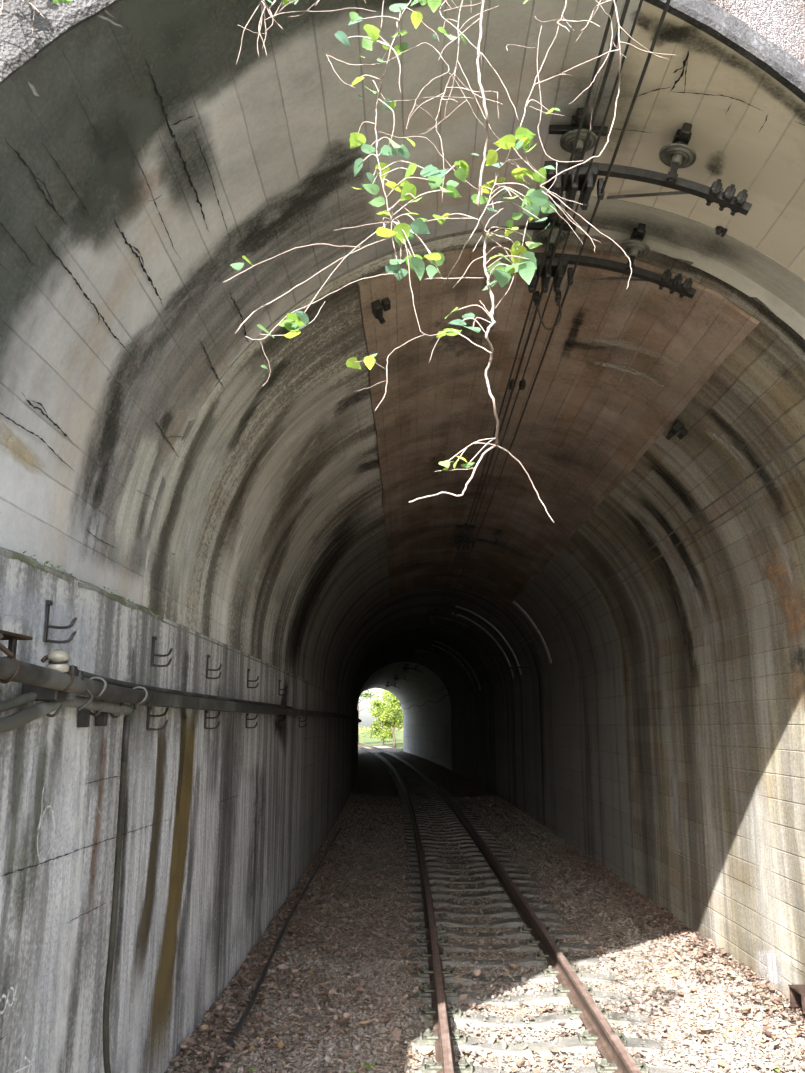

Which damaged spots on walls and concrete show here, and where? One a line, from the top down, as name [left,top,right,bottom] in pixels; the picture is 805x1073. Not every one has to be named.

crack [27,79,40,97]
crack [0,139,164,354]
crack [96,9,123,28]
leakage [161,124,211,197]
crack [144,55,231,242]
leakage [82,145,356,510]
crack [639,51,768,130]
leakage [115,362,288,600]
leakage [230,385,379,668]
leakage [0,726,106,1073]
rust [136,716,199,1045]
leakage [183,711,221,979]